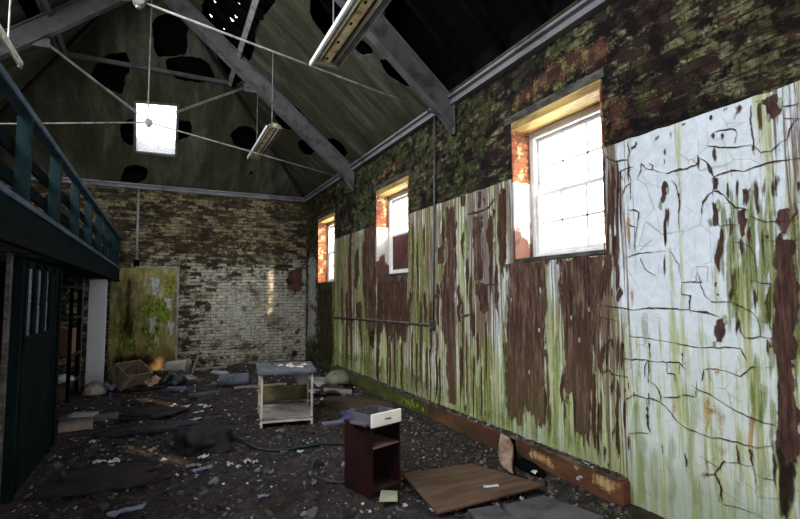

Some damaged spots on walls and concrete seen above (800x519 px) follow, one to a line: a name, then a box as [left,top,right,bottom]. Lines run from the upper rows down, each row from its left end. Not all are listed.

water stain [119,279,133,337]
peeling [275,254,318,343]
water stain [319,226,430,392]
flaking render [365,225,408,344]
flaking render [438,195,466,405]
water stain [457,307,580,457]
flaking render [472,188,606,435]
flaking render [613,235,623,302]
crack [593,103,800,514]
water stain [721,190,775,369]
water stain [750,358,776,449]
flaking render [765,208,800,466]